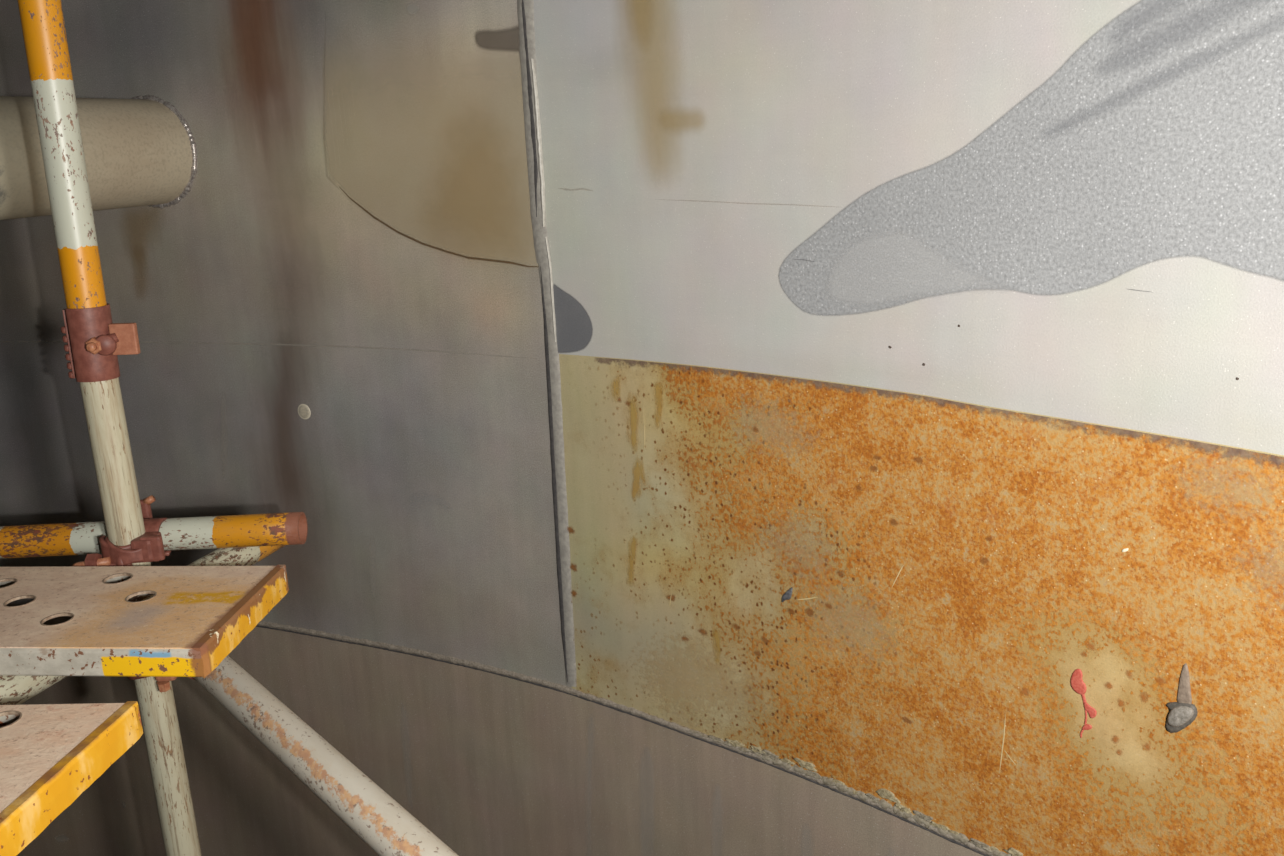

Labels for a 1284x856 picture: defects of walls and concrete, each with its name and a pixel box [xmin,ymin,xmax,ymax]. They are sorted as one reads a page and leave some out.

corrosion [597,358,1284,856]